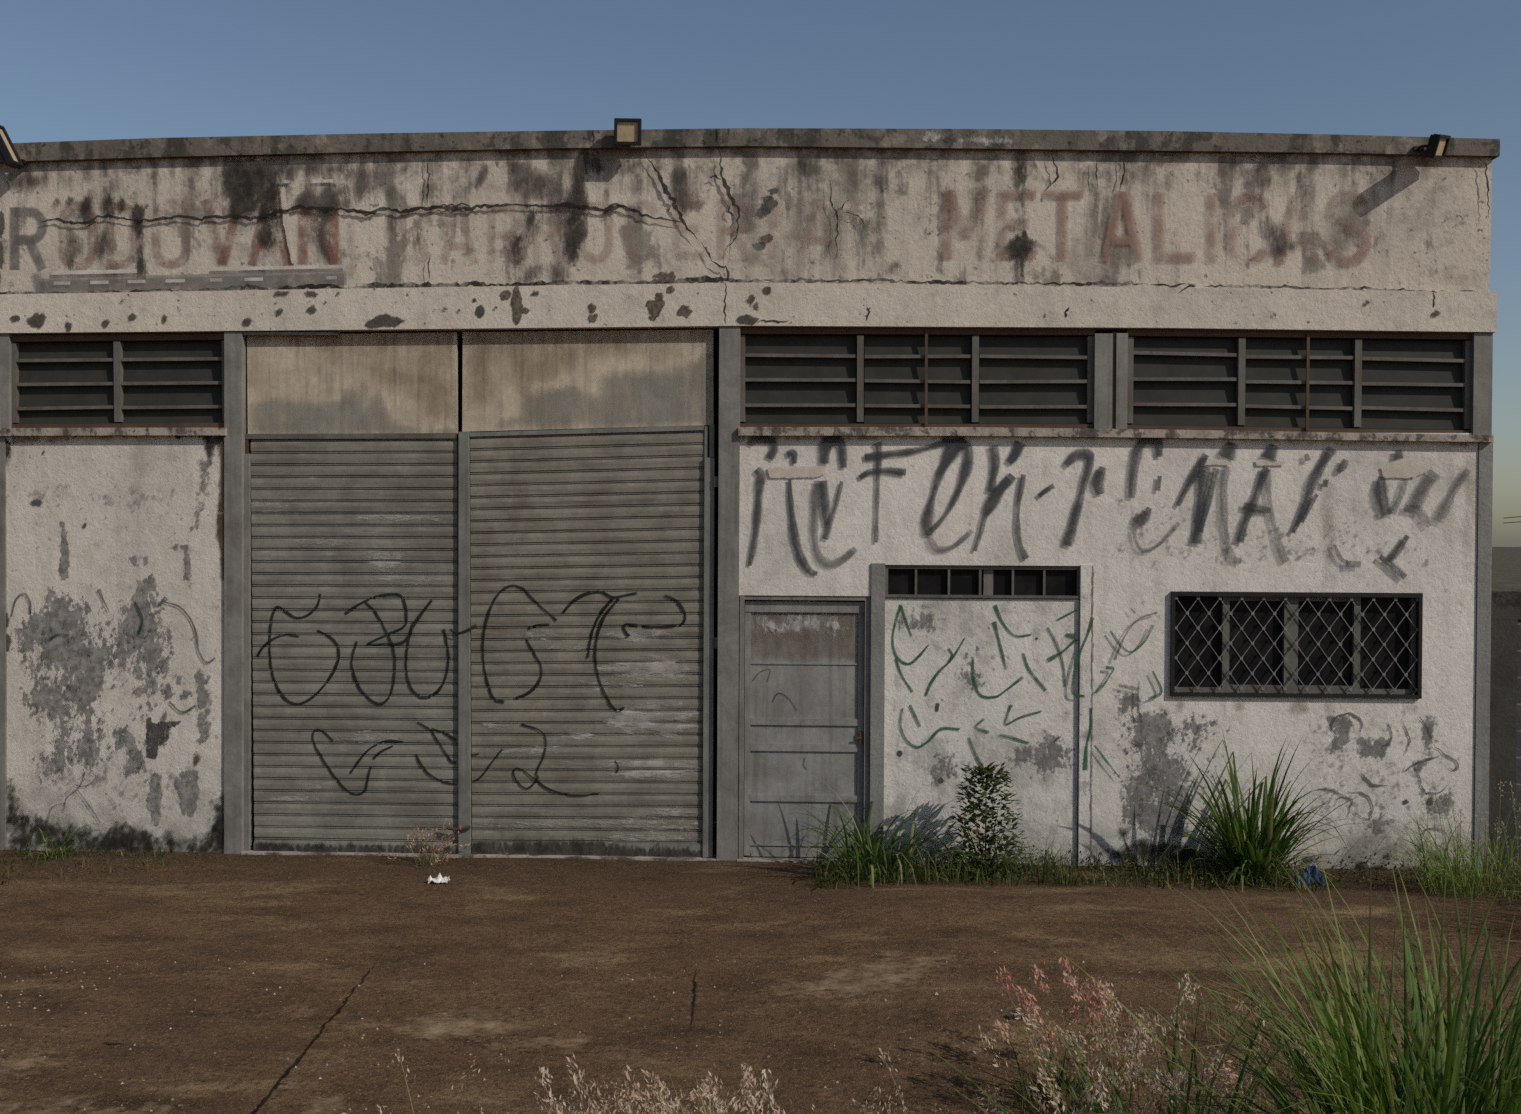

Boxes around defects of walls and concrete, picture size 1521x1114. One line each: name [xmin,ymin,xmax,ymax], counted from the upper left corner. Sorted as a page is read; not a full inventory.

water stain [55,194,147,275]
water stain [216,156,373,261]
spalling [365,314,405,328]
water stain [511,149,602,325]
spalling [646,271,693,321]
crack [0,129,1475,323]
water stain [1008,150,1037,281]
water stain [1236,154,1294,255]
peeling [6,521,212,826]
peeling [1110,690,1230,841]
peeling [1314,715,1455,842]
crack [251,966,374,1114]